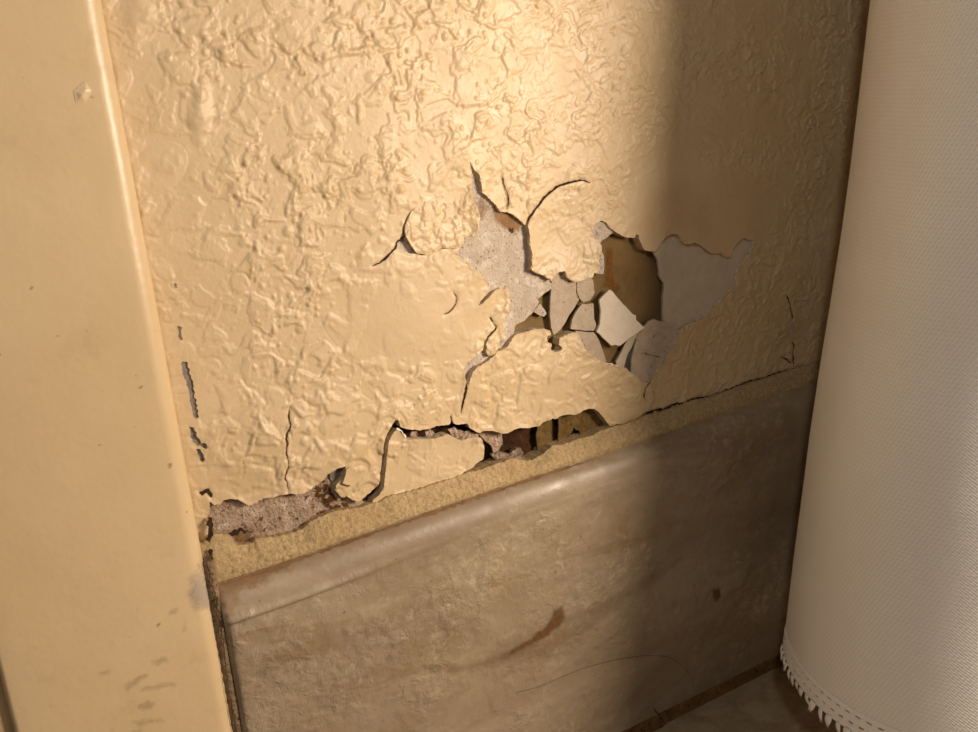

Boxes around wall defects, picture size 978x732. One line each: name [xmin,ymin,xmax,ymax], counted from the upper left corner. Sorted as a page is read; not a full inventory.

peeling [397,238,414,253]
peeling [456,166,753,383]
crack [284,409,292,489]
spalling [205,409,603,543]